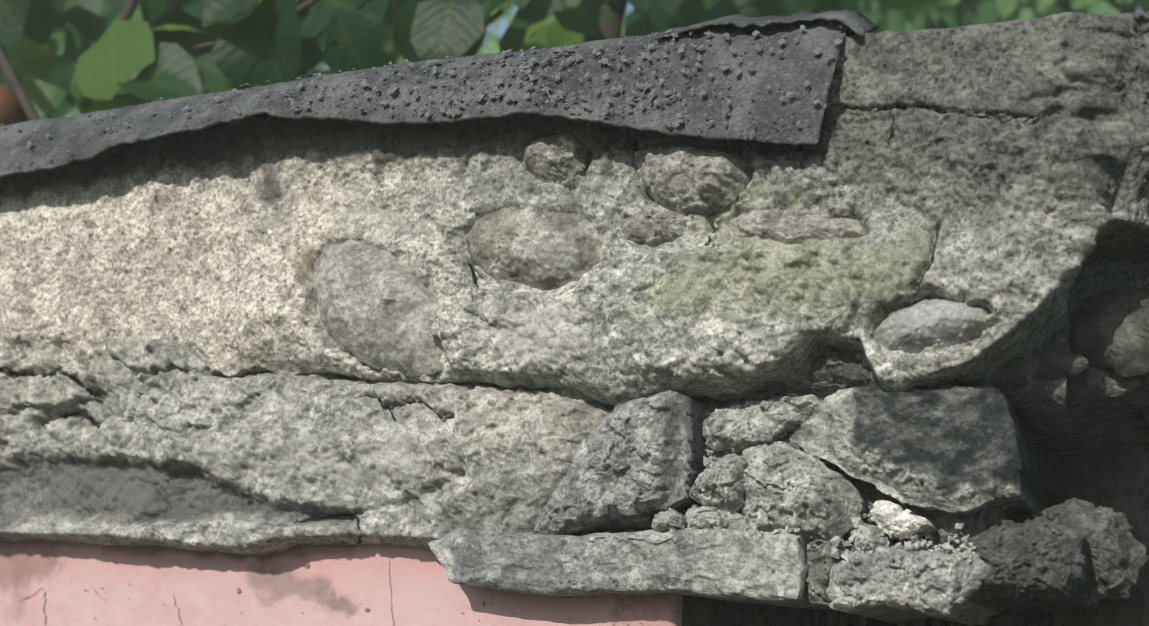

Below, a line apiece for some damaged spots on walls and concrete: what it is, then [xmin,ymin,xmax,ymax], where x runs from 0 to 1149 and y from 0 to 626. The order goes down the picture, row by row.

crack [843,105,1057,145]
crack [359,395,454,421]
crack [294,513,362,545]